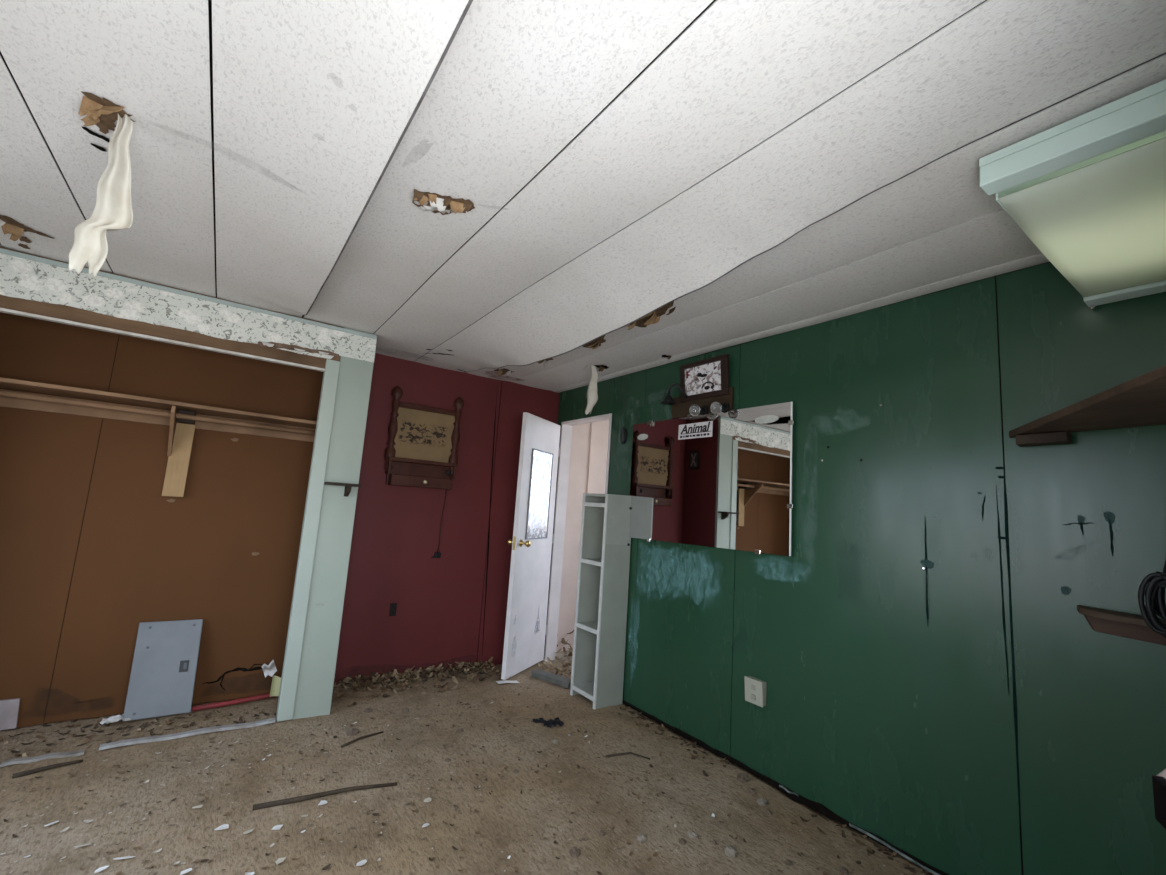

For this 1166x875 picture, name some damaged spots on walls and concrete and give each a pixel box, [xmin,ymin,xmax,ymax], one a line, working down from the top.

peeling [78,96,125,126]
peeling [413,189,472,214]
peeling [0,219,24,241]
peeling [627,307,676,330]